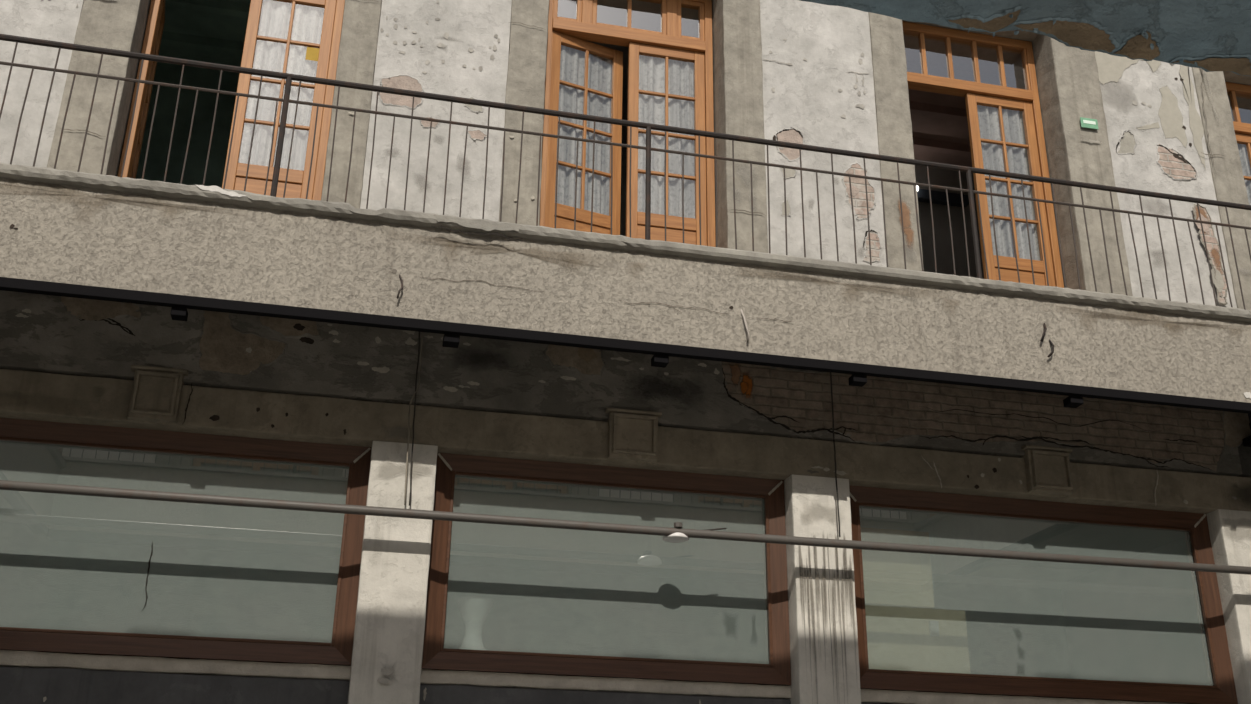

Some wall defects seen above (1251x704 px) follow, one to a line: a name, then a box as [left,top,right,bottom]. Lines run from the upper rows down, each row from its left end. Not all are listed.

flaking render [378,16,449,128]
flaking render [464,97,484,113]
peeling [945,6,1251,81]
flaking render [1116,130,1137,155]
flaking render [1156,142,1198,181]
flaking render [841,162,882,264]
flaking render [1192,203,1228,306]
crack [722,368,858,441]
crack [919,406,1211,503]
water stain [799,537,855,682]